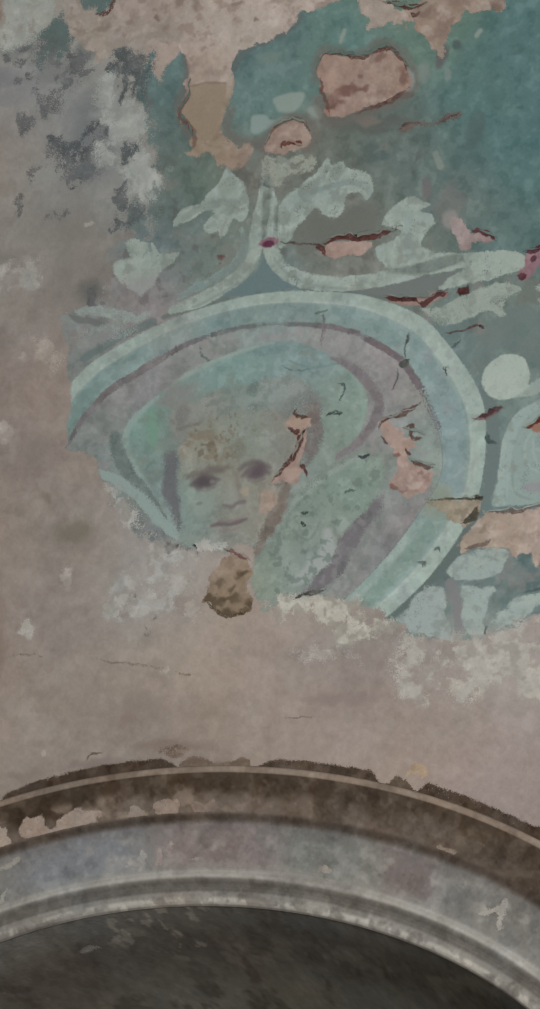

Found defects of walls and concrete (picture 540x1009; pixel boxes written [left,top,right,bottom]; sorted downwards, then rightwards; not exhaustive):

peeling [357,0,507,59]
water stain [0,0,173,235]
peeling [63,0,340,171]
peeling [316,43,413,118]
peeling [314,225,403,260]
peeling [449,216,496,252]
peeling [257,395,329,514]
peeling [378,401,540,568]
water stain [263,589,540,718]
peeling [0,807,102,847]
peeling [127,798,215,818]
water stain [2,742,540,840]